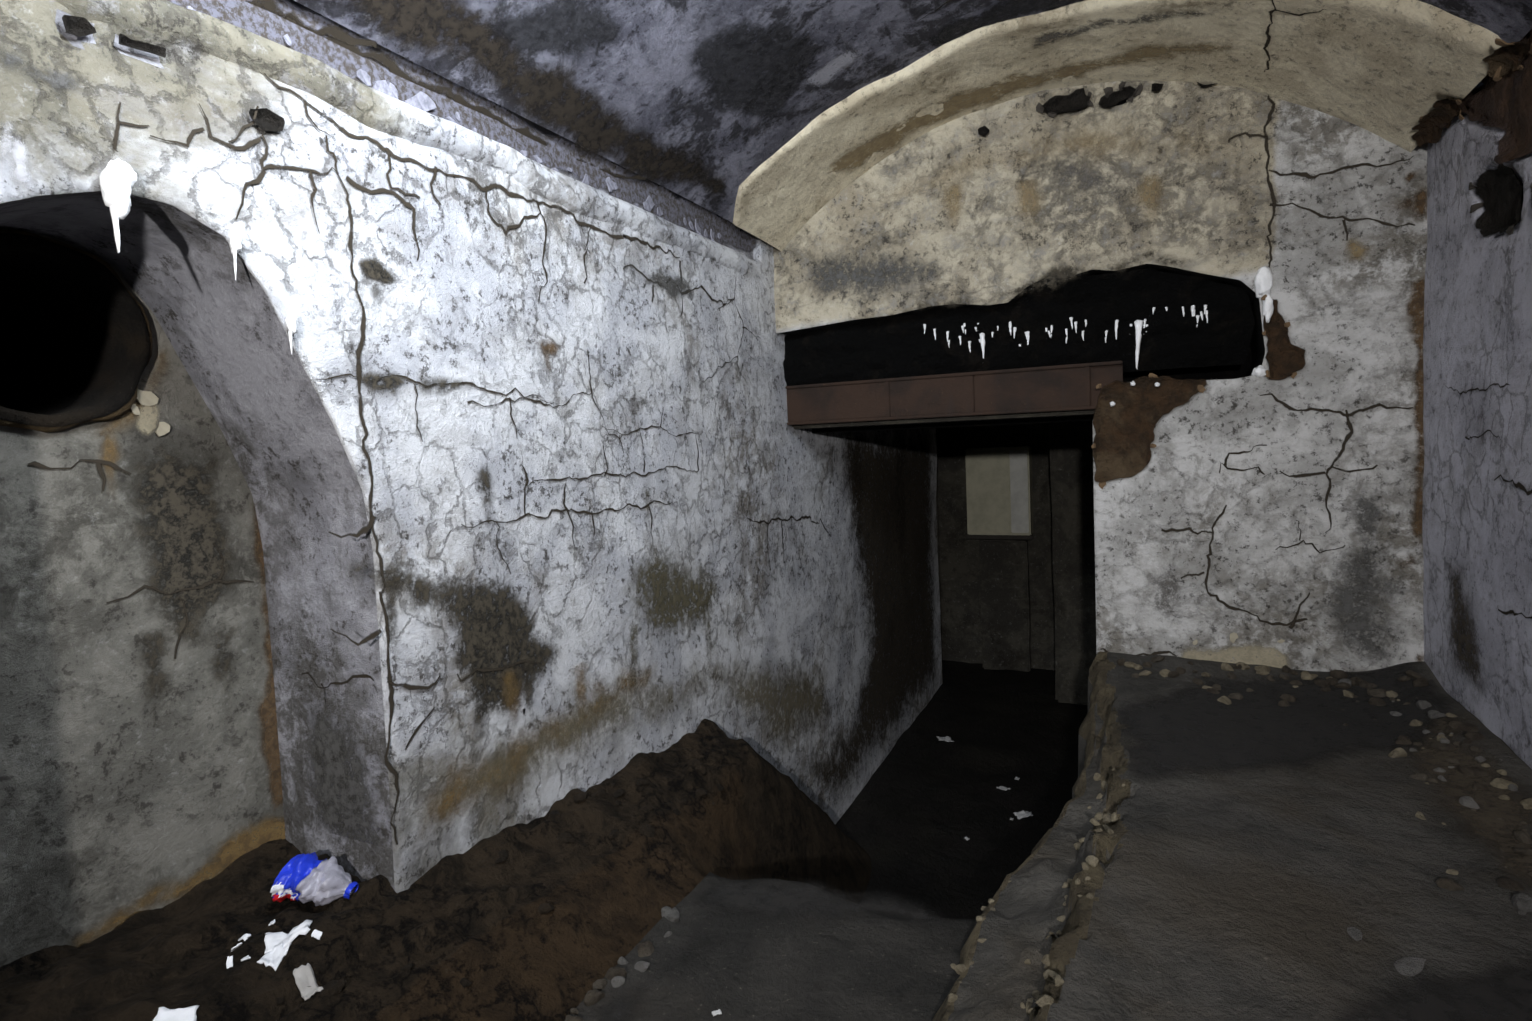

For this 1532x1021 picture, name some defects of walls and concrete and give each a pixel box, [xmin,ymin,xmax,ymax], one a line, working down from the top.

crack [1228,0,1415,268]
spalling [1411,29,1532,237]
crack [28,459,132,491]
crack [106,73,761,845]
leakage [479,468,491,504]
crack [747,515,830,569]
spalling [1091,373,1207,489]
crack [1161,393,1413,629]
crack [1446,383,1532,495]
leakage [348,564,557,735]
leakage [630,549,717,670]
crack [1498,609,1532,618]